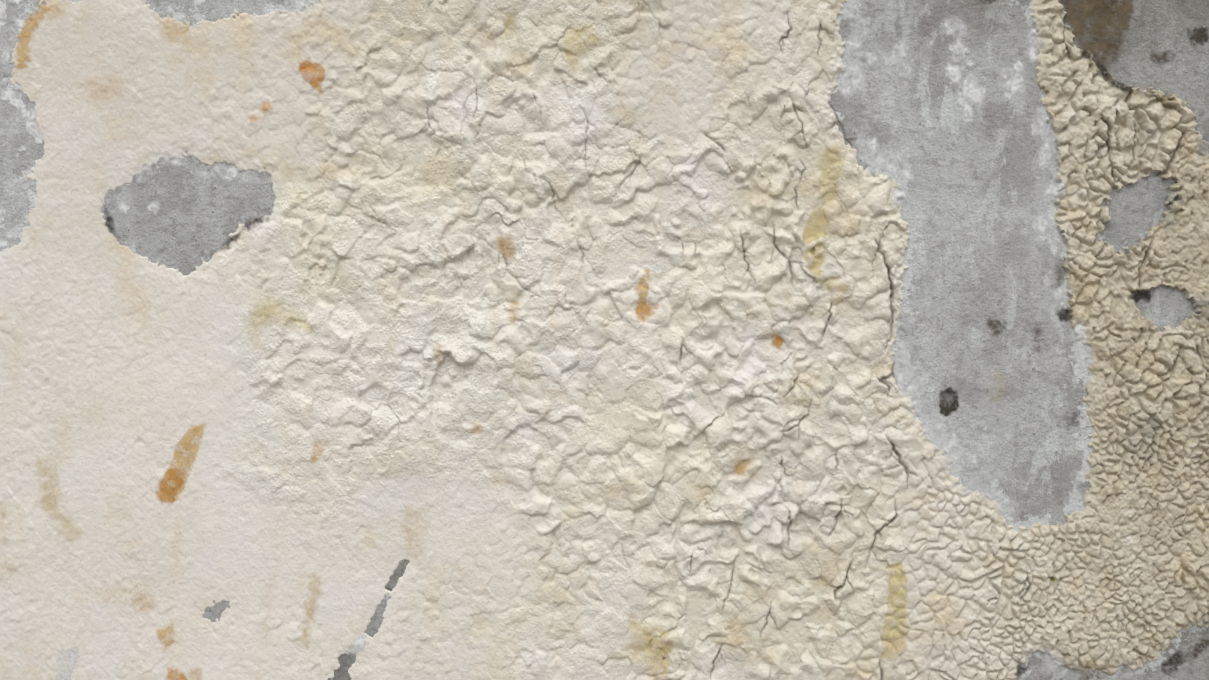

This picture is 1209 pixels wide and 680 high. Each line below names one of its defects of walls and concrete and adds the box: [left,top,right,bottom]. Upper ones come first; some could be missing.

peeling [145,0,320,26]
rust [300,62,324,90]
damp [1065,0,1133,92]
peeling [0,0,82,252]
peeling [101,151,276,275]
rust [636,270,651,319]
crack [407,0,1188,680]
peeling [828,0,1209,680]
rust [157,425,204,502]
peeling [364,560,410,637]
peeling [327,653,356,680]
crack [279,612,412,680]